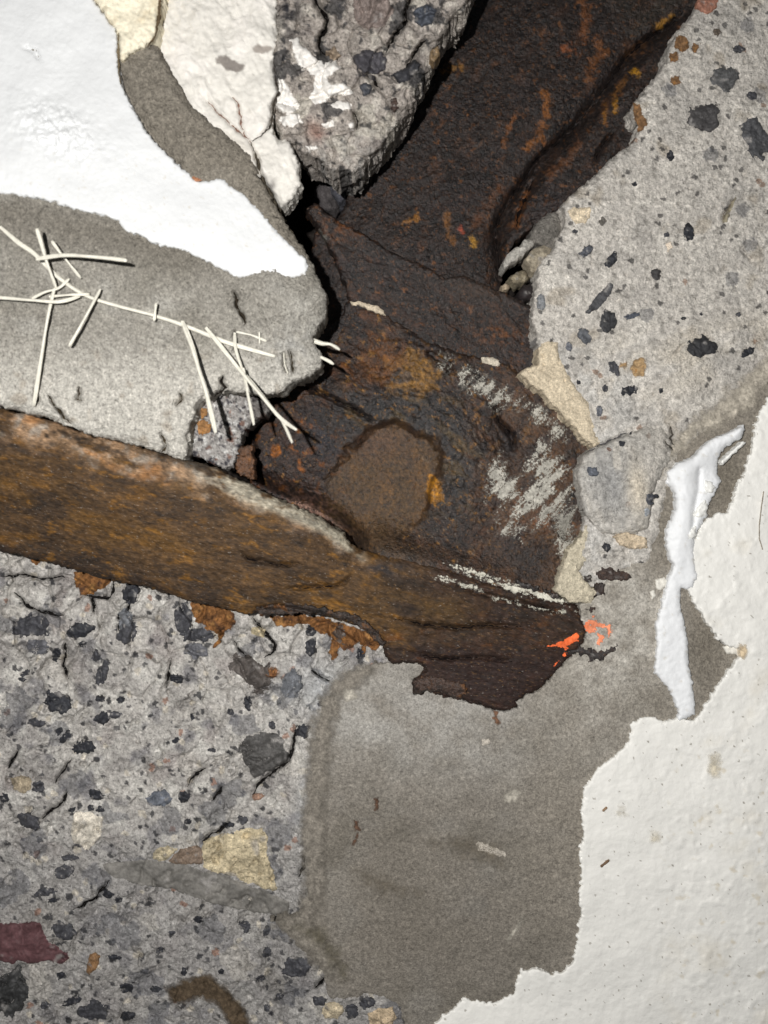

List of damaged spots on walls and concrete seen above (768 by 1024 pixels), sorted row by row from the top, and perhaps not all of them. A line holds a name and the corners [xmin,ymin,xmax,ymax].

peeling [0,0,475,278]
peeling [434,0,768,1024]
rust [74,572,111,598]
rust [190,601,236,648]
crack [234,614,277,658]
rust [270,614,380,660]
water stain [344,690,357,701]
crack [252,726,297,795]
crack [42,760,71,819]
spalling [0,552,404,1024]
crack [188,768,222,801]
water stain [504,789,521,803]